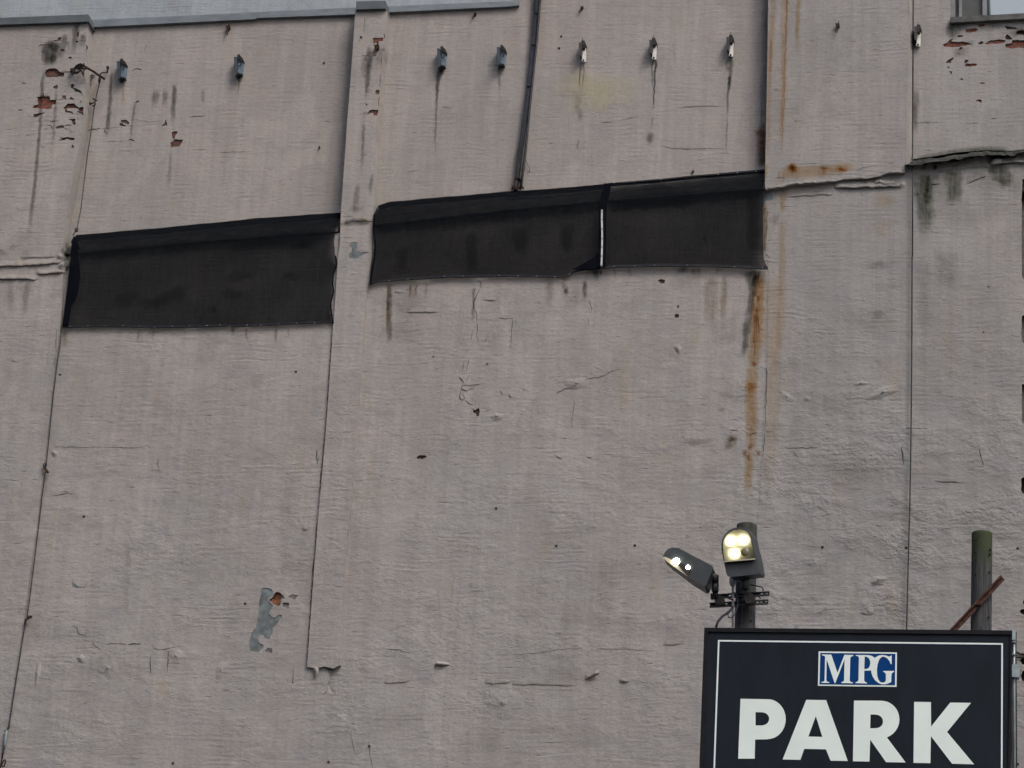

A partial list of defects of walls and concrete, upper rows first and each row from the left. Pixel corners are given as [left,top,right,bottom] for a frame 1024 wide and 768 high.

spalling [943,24,1024,80]
spalling [18,68,84,149]
crack [459,282,513,405]
peeling [249,588,299,653]